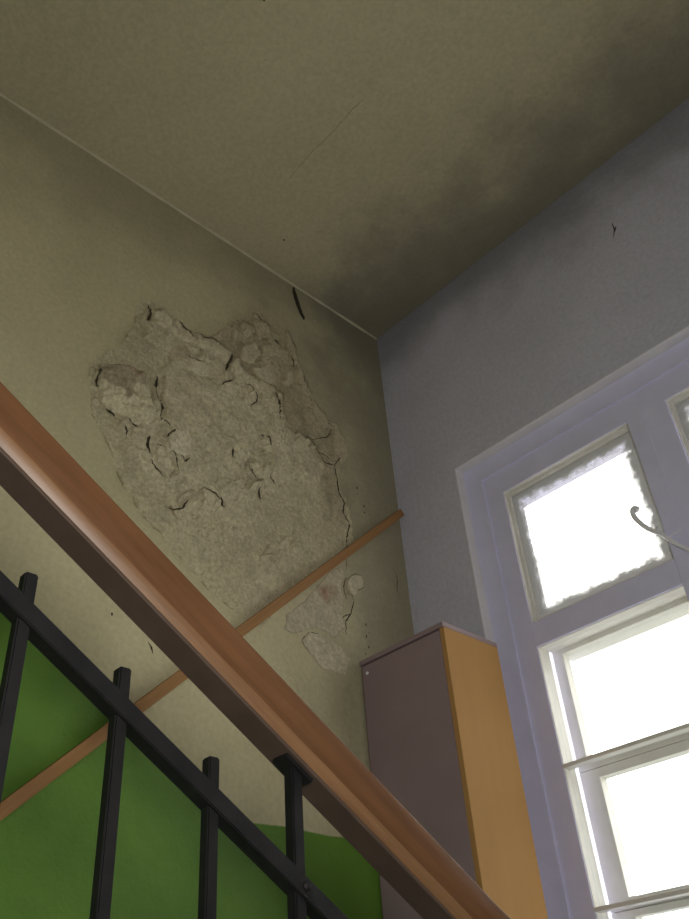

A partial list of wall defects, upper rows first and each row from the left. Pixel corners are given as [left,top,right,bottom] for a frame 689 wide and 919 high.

flaking render [88,300,353,628]
flaking render [292,287,305,320]